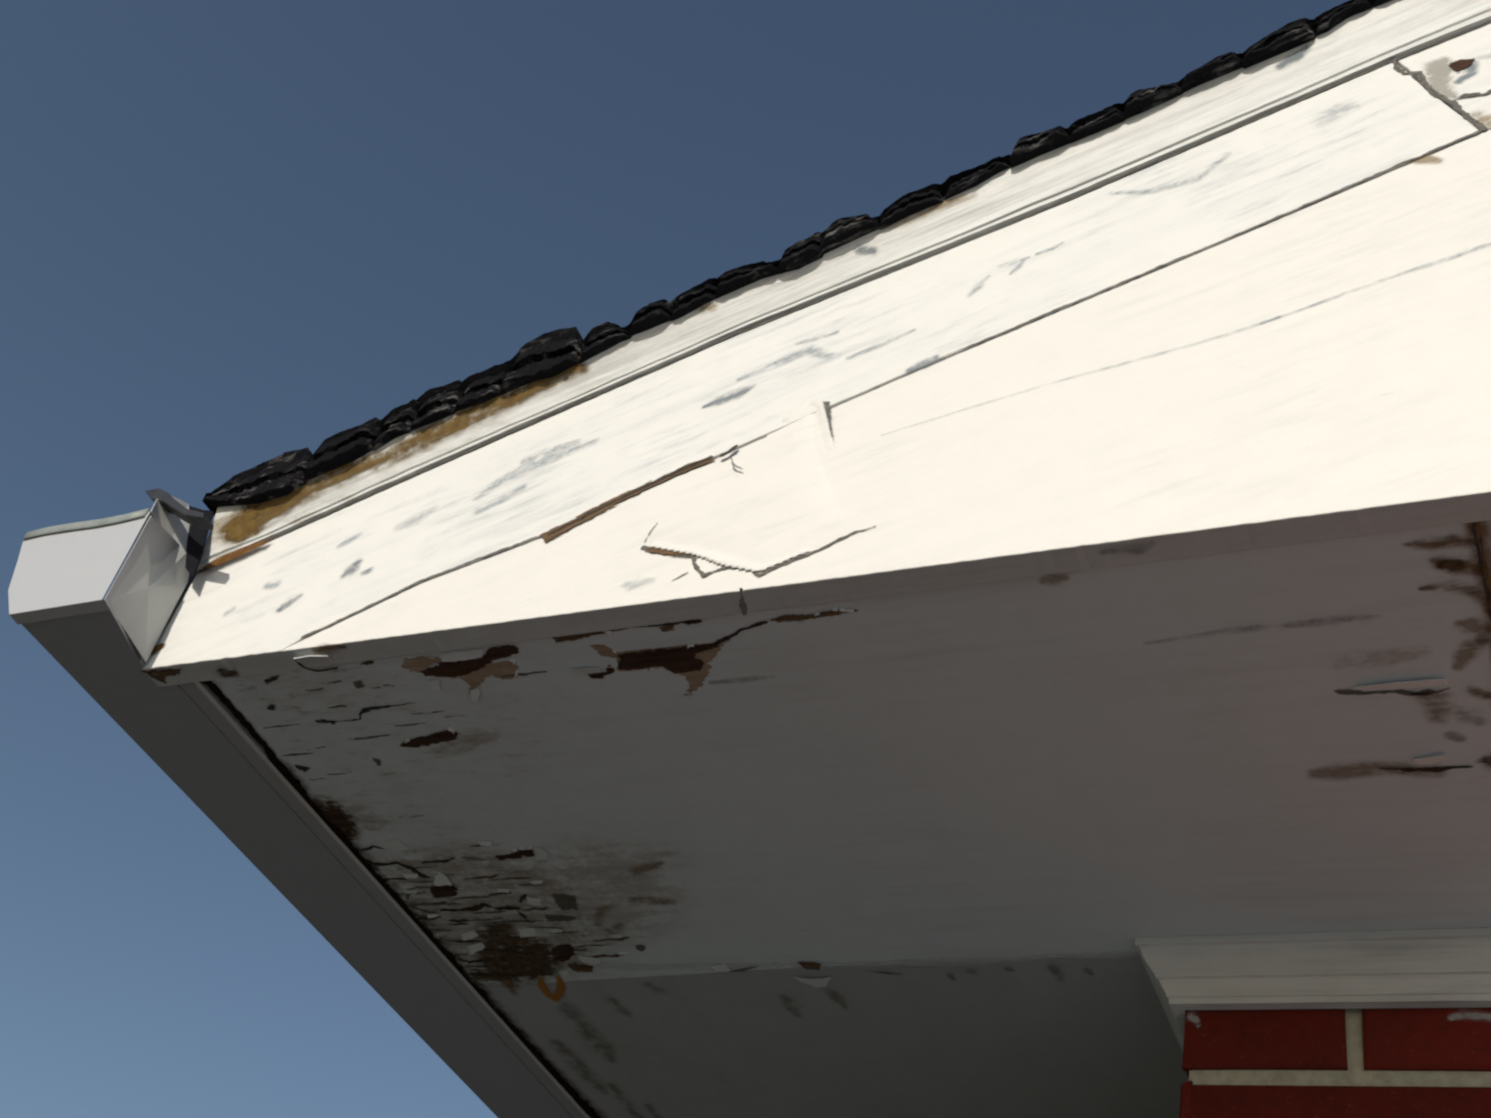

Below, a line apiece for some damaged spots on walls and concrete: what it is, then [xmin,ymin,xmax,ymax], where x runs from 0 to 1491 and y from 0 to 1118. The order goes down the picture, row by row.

crack [940,58,1491,358]
crack [719,445,743,470]
crack [293,537,536,672]
peeling [306,660,394,691]
peeling [401,645,547,701]
peeling [552,607,859,697]
peeling [354,711,463,749]
peeling [384,841,645,977]